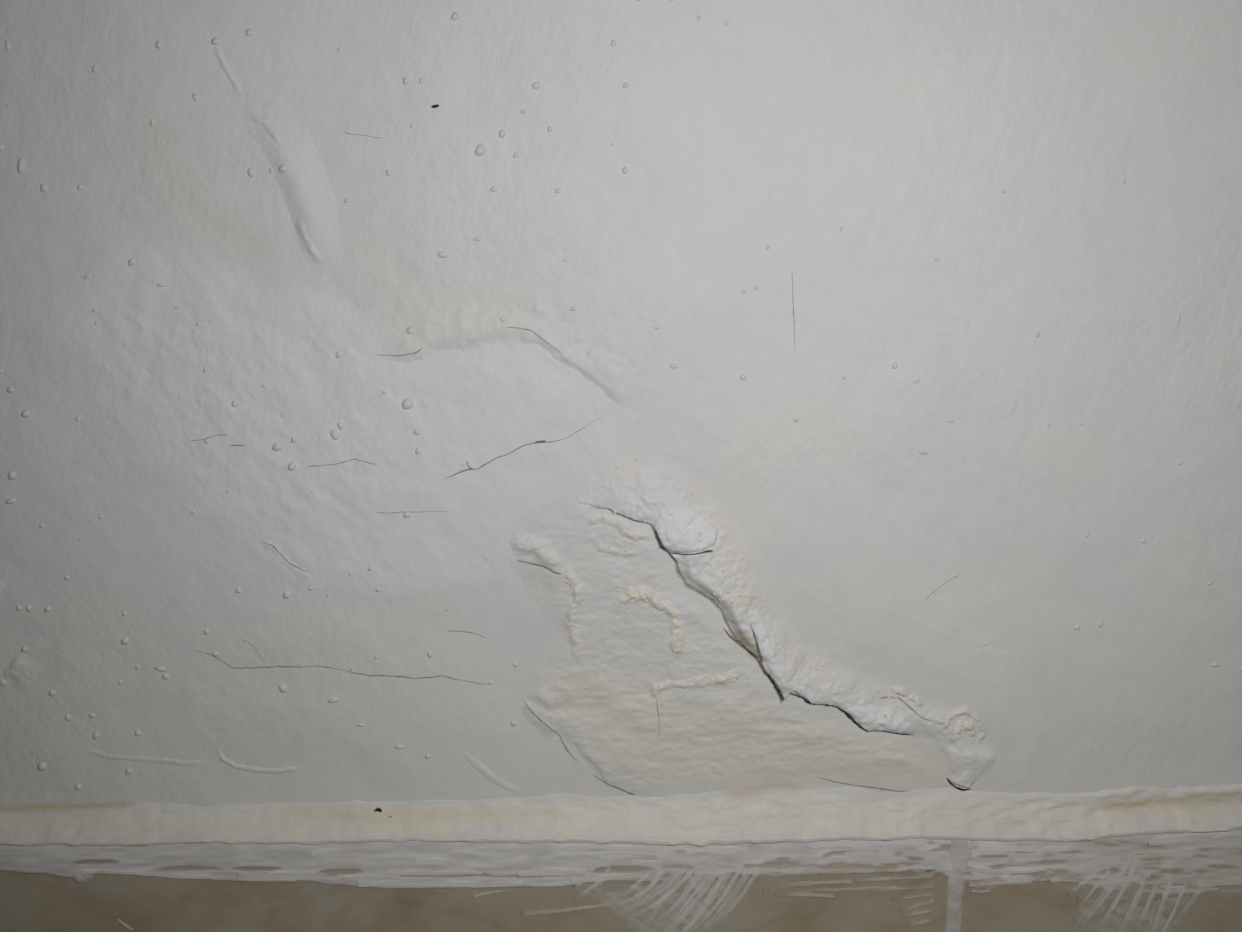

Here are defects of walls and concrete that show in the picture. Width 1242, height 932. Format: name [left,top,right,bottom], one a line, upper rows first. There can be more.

crack [602,508,927,735]
crack [202,640,289,668]
crack [821,778,903,792]
crack [947,778,970,791]